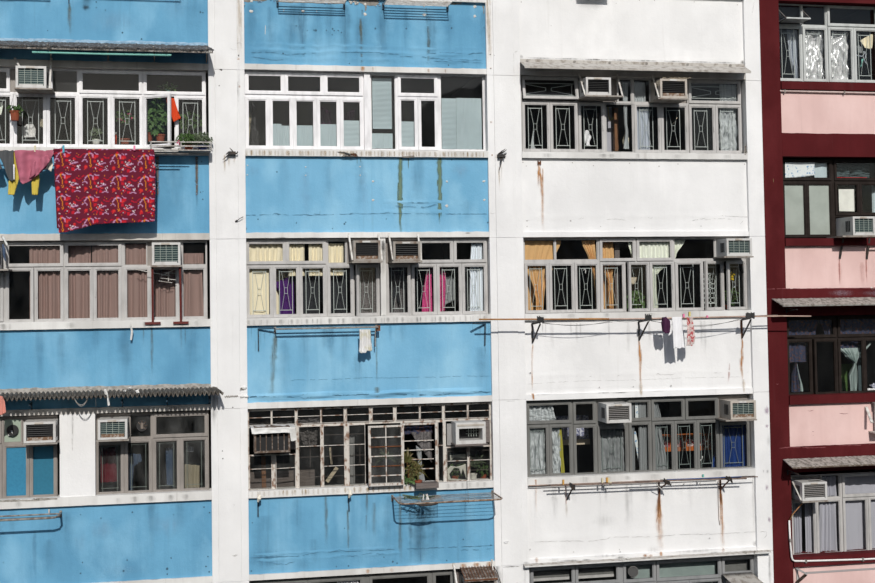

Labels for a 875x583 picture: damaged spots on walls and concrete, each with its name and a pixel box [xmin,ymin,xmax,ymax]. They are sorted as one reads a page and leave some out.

water stain [397,157,409,225]